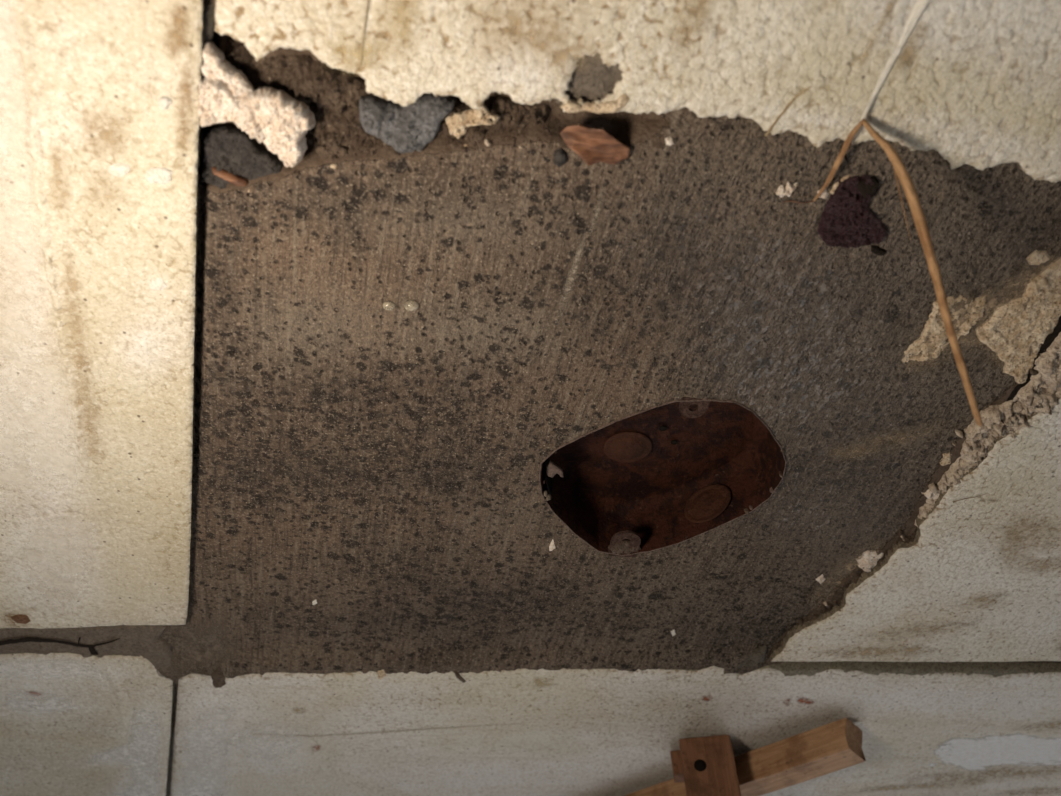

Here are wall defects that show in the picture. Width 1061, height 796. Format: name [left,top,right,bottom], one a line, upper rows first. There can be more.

spalling [198,29,675,196]
peeling [871,245,887,256]
crack [1006,316,1061,402]
spalling [763,250,1061,665]
crack [0,637,120,655]
spalling [211,666,226,688]